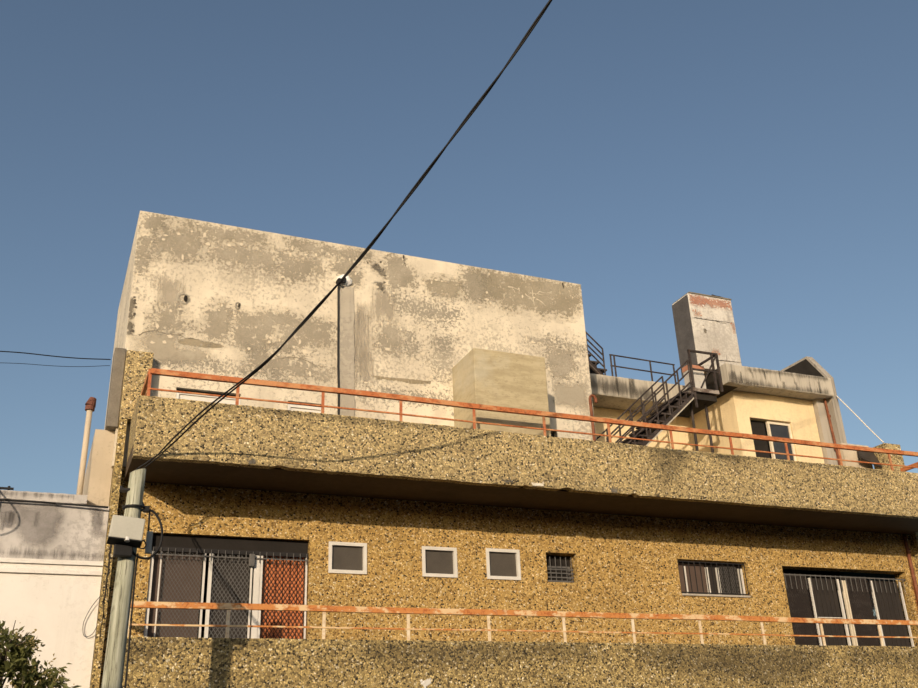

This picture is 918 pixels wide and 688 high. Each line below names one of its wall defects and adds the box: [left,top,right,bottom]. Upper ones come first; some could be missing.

damp [355,291,395,381]
damp [241,337,336,384]
damp [555,378,650,407]